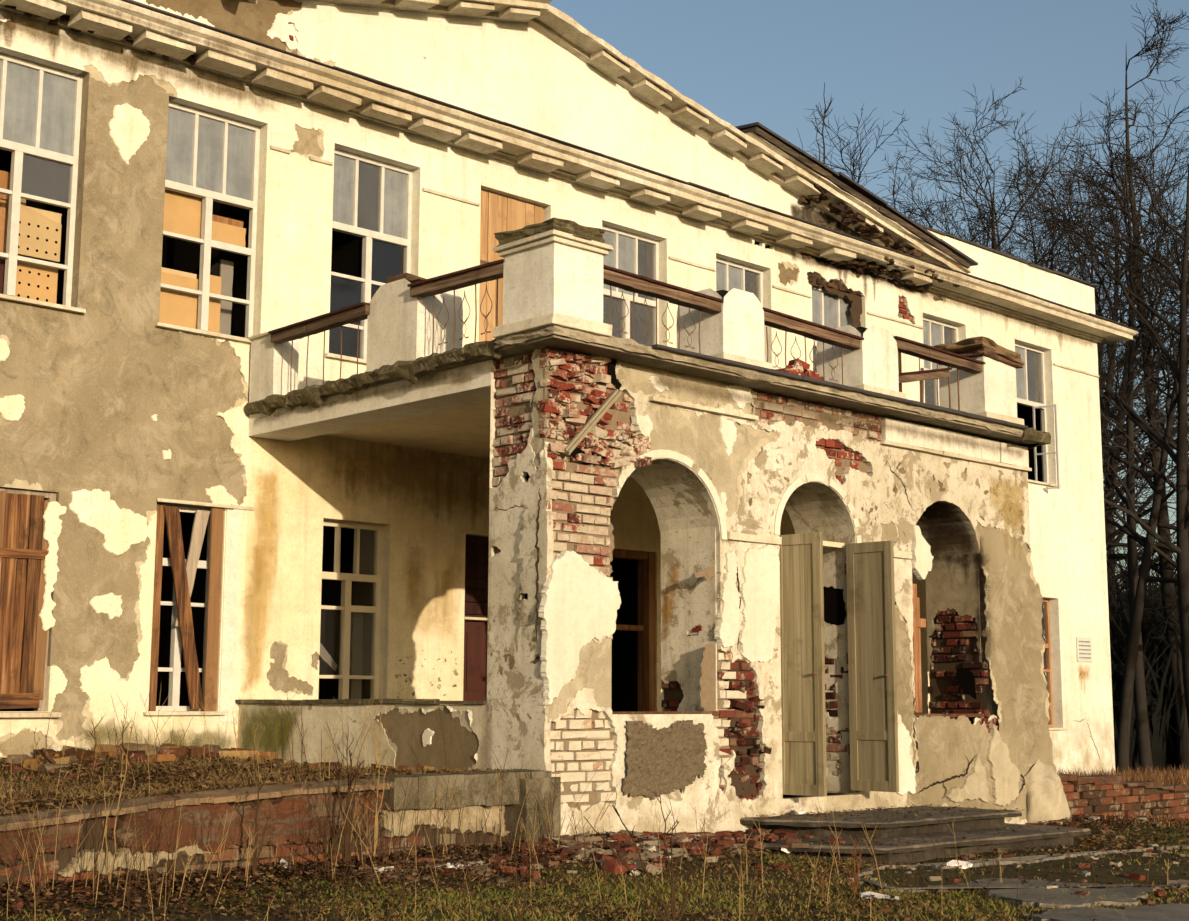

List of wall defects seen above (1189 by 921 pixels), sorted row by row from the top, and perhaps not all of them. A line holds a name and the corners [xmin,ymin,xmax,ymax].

spalling [0,5,94,34]
flaking render [145,0,335,66]
flaking render [290,124,324,159]
spalling [778,184,960,328]
flaking render [0,64,249,760]
leakage [248,478,275,680]
flaking render [488,347,1059,822]
flaking render [266,641,313,696]
flaking render [373,650,479,770]
crack [918,755,977,798]